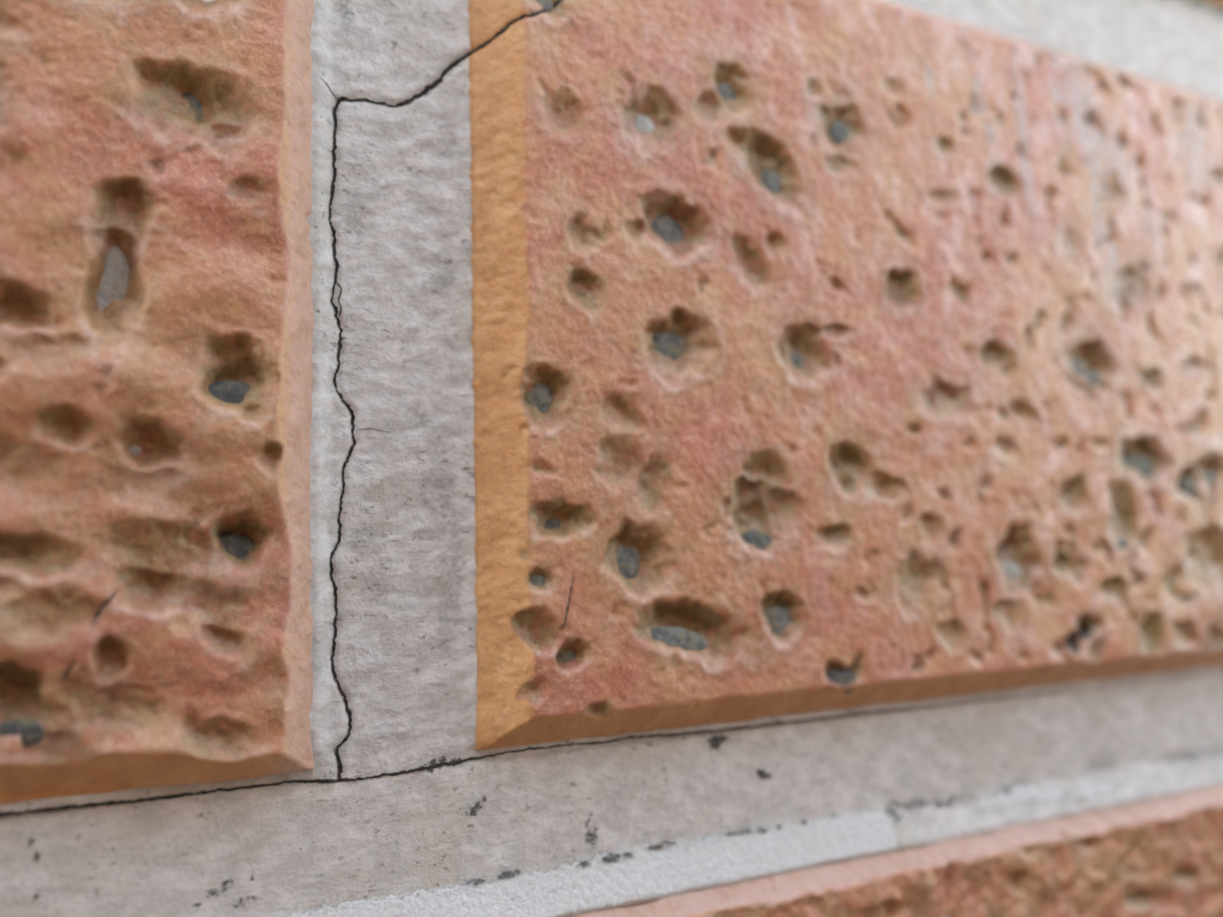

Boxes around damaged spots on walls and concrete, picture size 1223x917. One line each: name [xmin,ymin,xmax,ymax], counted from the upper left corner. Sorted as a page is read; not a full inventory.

crack [0,0,1060,818]